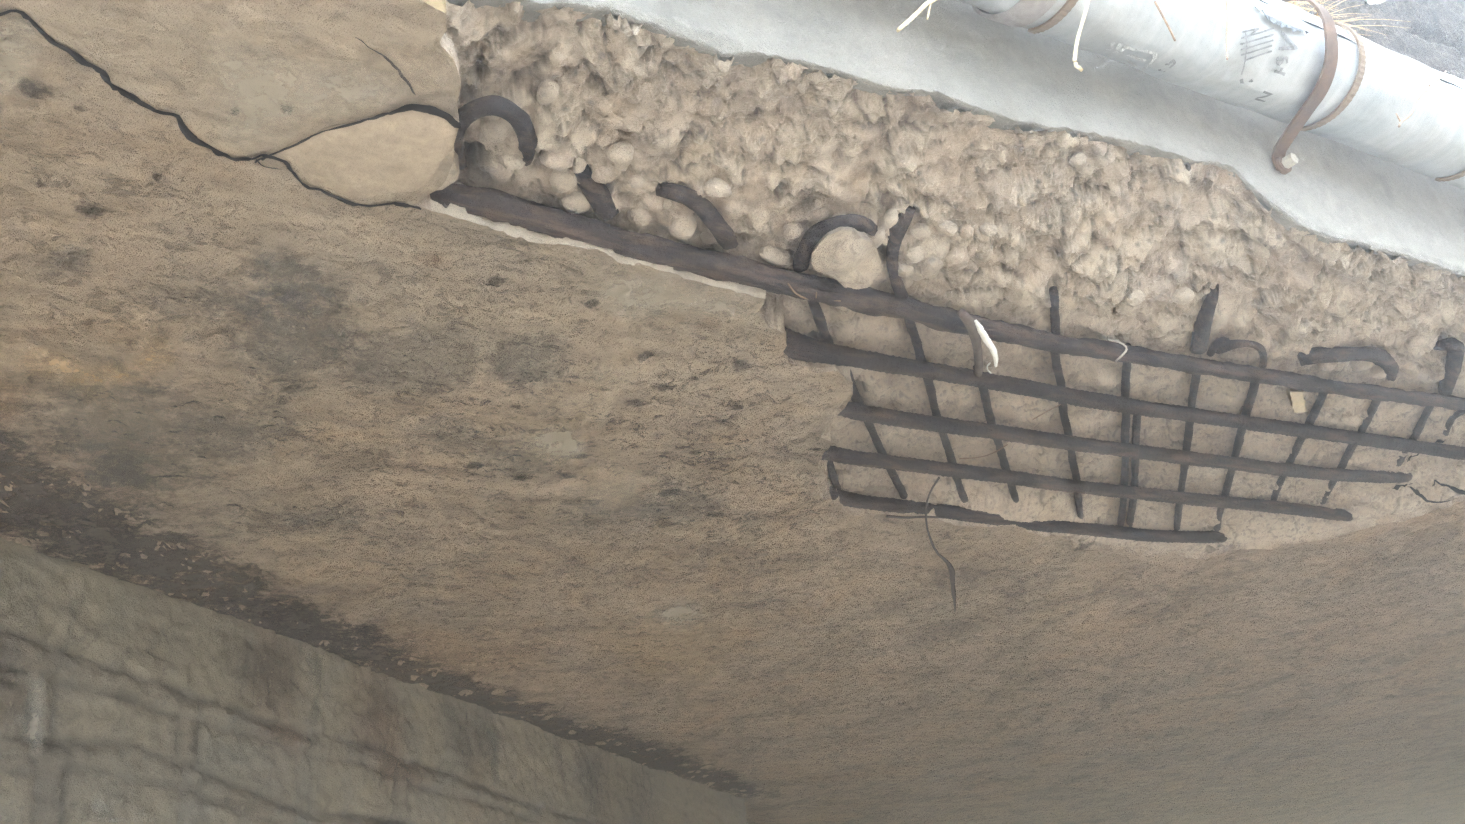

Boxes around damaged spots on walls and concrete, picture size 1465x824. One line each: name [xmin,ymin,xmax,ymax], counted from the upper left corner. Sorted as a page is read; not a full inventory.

crack [0,9,461,210]
spalling [400,0,1465,560]
water stain [0,431,778,797]